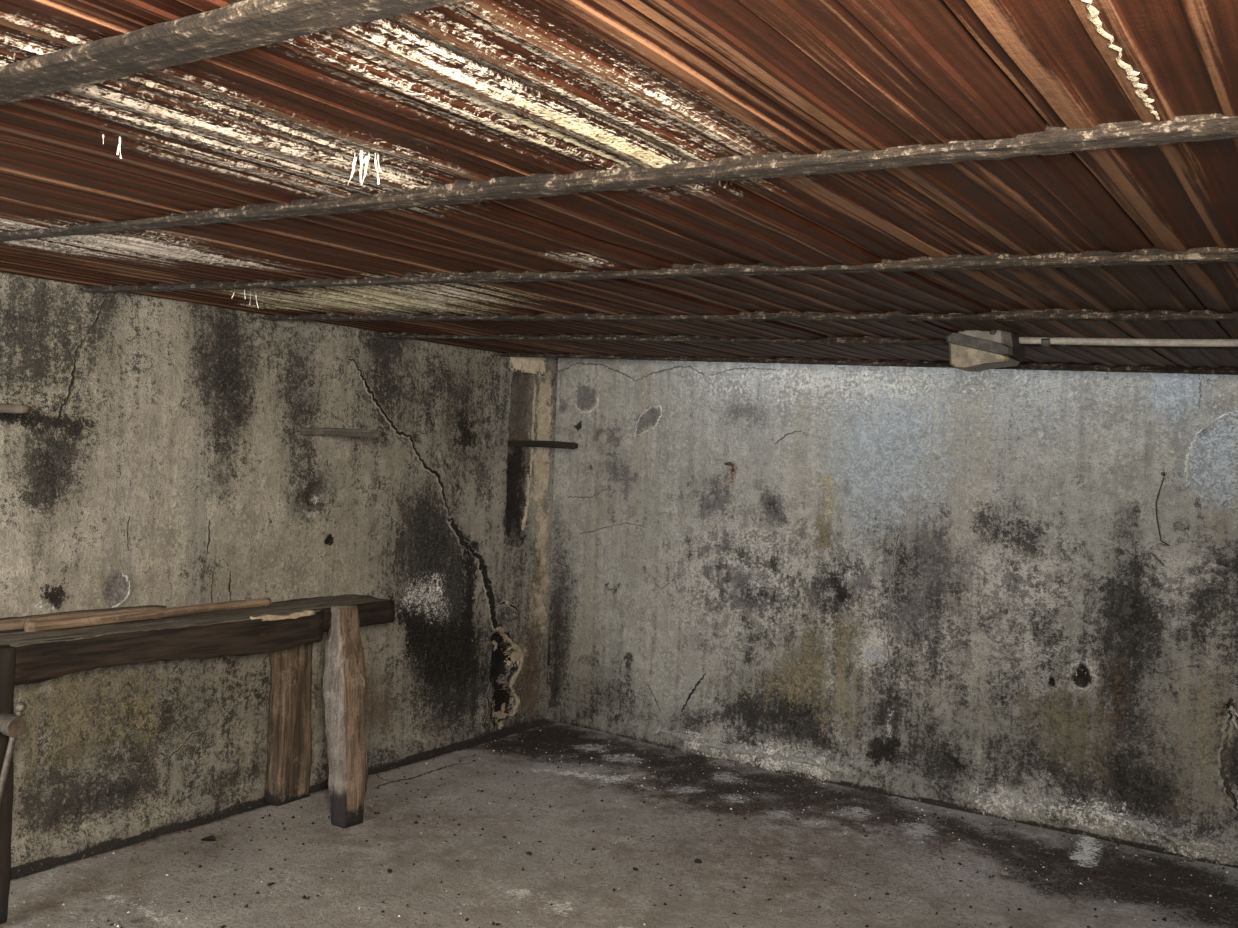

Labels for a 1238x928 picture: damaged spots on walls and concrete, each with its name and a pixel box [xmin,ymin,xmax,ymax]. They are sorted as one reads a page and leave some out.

leakage [0,218,298,271]
leakage [0,273,130,564]
crack [54,298,106,495]
leakage [13,664,196,866]
leakage [189,272,551,510]
crack [346,355,498,634]
leakage [361,332,490,746]
spalling [484,625,533,729]
leakage [671,474,901,767]
leakage [970,501,1043,560]
leakage [988,573,1224,855]
peeling [1214,698,1238,813]